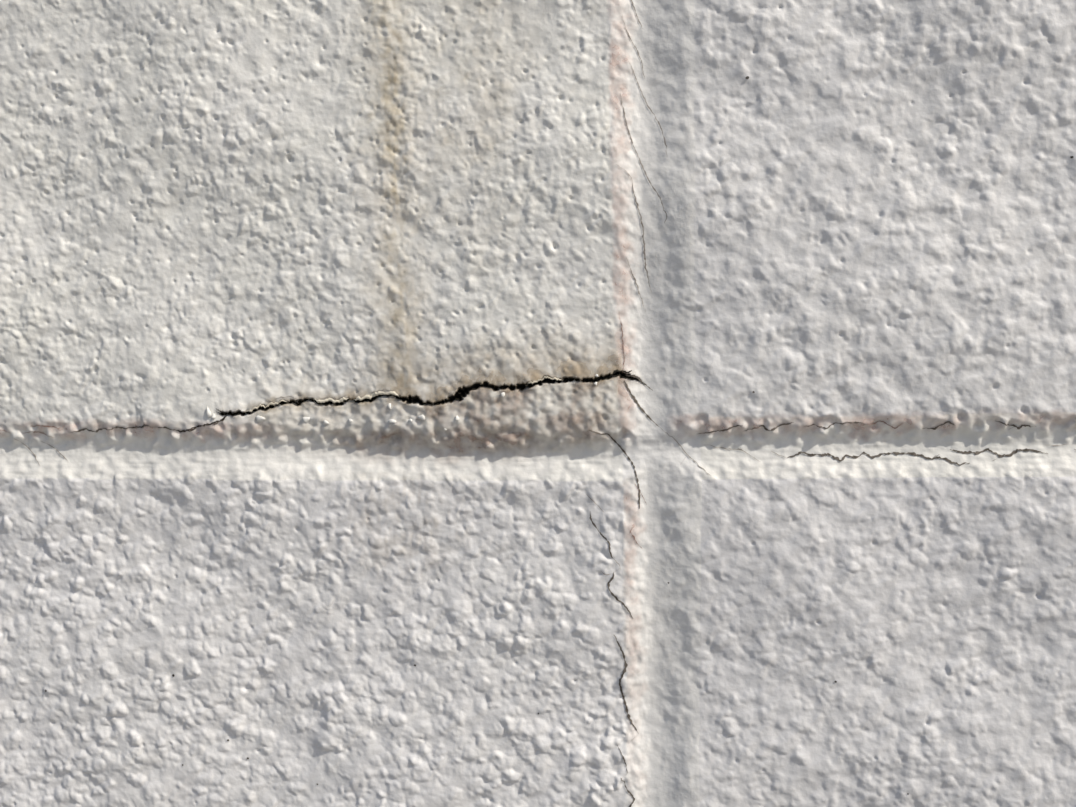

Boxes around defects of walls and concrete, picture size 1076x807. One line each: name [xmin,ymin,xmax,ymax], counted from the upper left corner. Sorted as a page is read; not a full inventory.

crack [2,0,1065,476]
crack [587,430,647,807]